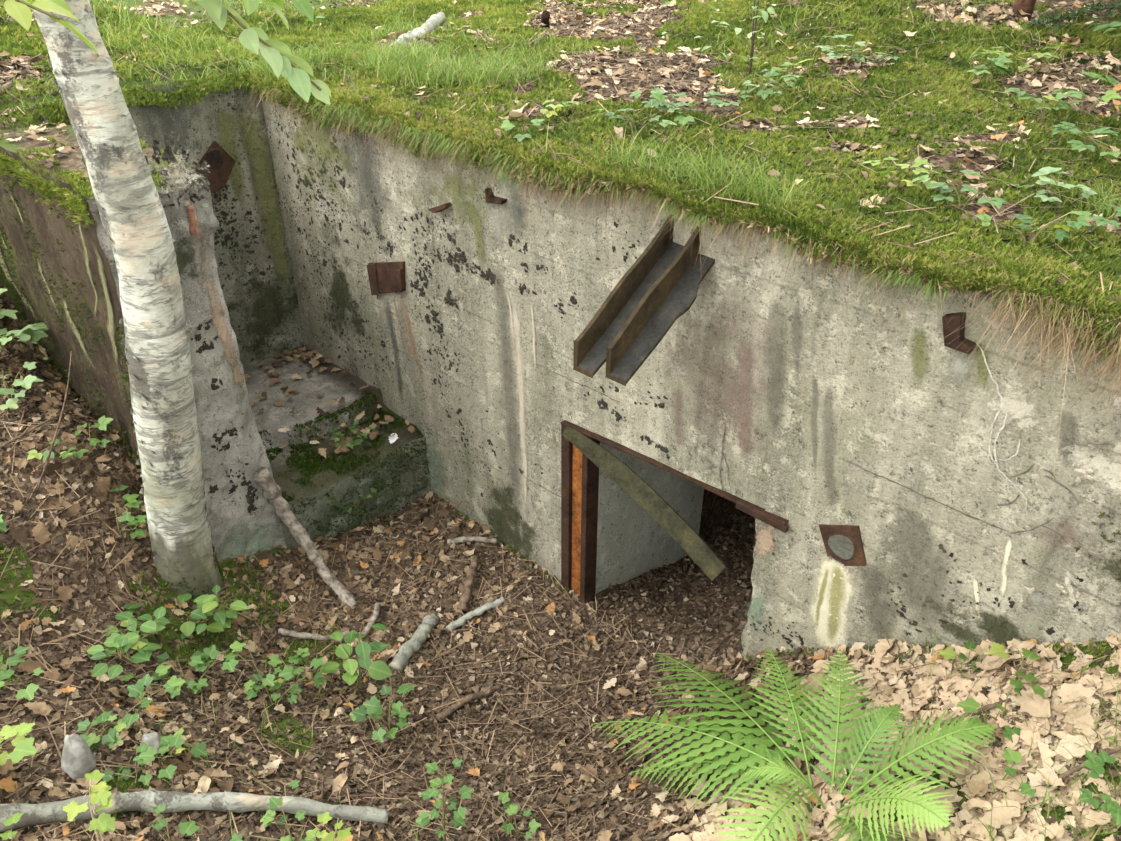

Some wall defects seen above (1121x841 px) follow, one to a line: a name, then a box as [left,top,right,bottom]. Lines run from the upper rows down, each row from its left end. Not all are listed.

water stain [808,558,854,650]